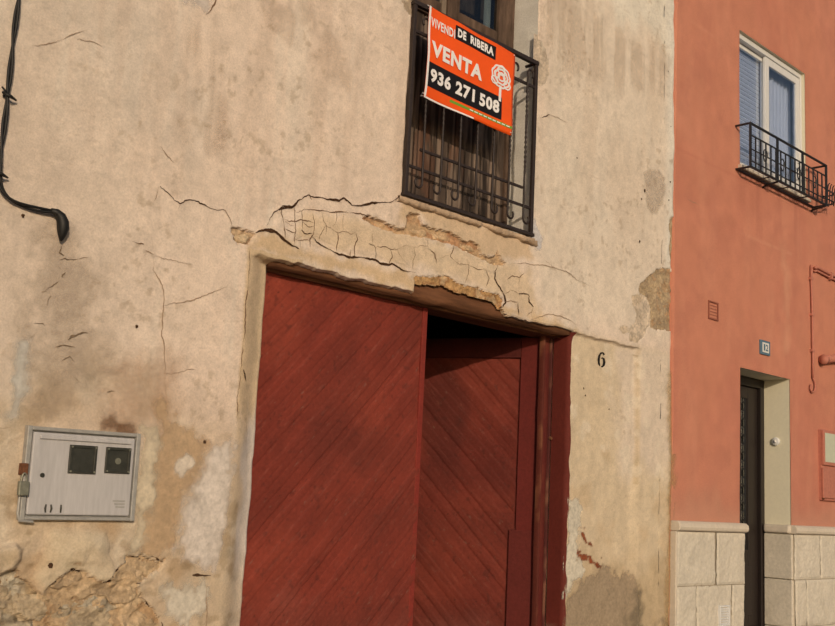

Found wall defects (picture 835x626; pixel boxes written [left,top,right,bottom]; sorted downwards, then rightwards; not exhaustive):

crack [136,242,223,402]
crack [237,194,584,449]
spalling [362,214,503,266]
spalling [414,275,502,310]
spalling [619,217,673,343]
spalling [0,399,209,626]
peeling [577,532,602,568]